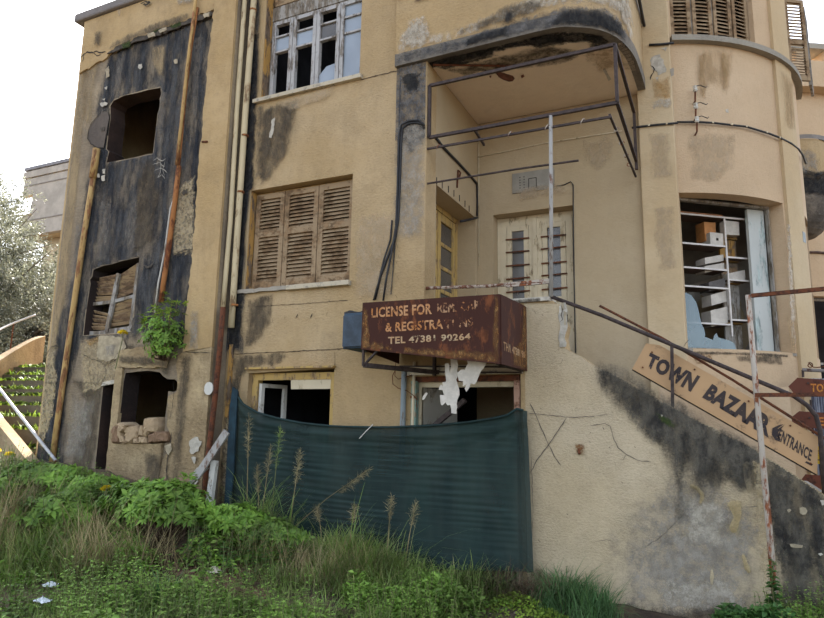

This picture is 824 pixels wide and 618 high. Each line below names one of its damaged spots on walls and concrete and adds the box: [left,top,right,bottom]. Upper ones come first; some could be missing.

spalling [107,11,212,54]
leakage [395,2,626,234]
leakage [801,153,824,195]
leakage [226,0,296,401]
flaking render [97,335,126,362]
crack [529,413,649,462]
leakage [598,365,824,618]